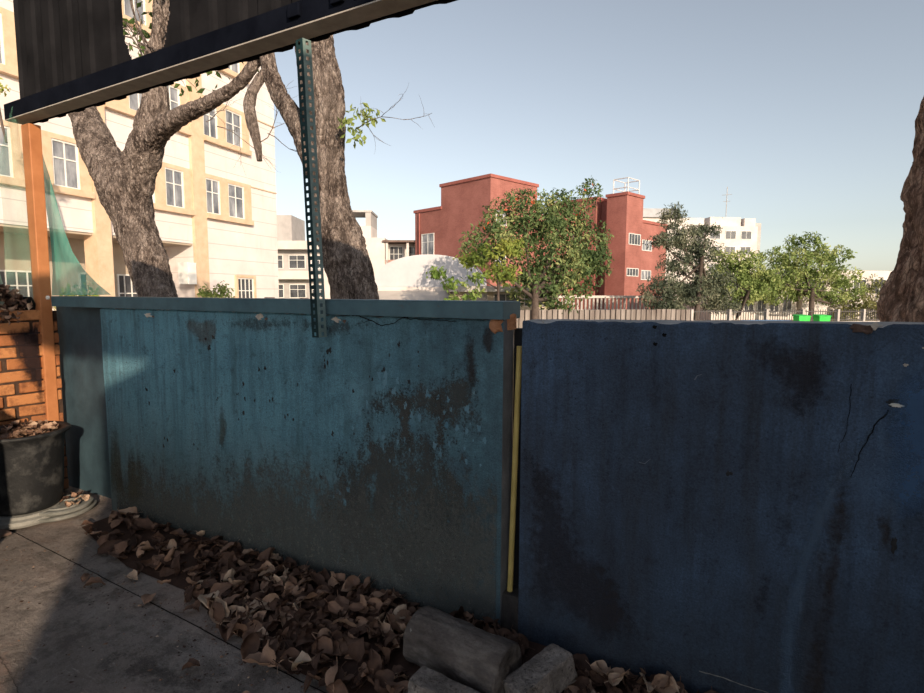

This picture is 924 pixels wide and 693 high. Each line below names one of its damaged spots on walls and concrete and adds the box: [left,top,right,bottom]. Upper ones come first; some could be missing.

leakage [115,329,497,627]
crack [838,384,889,476]